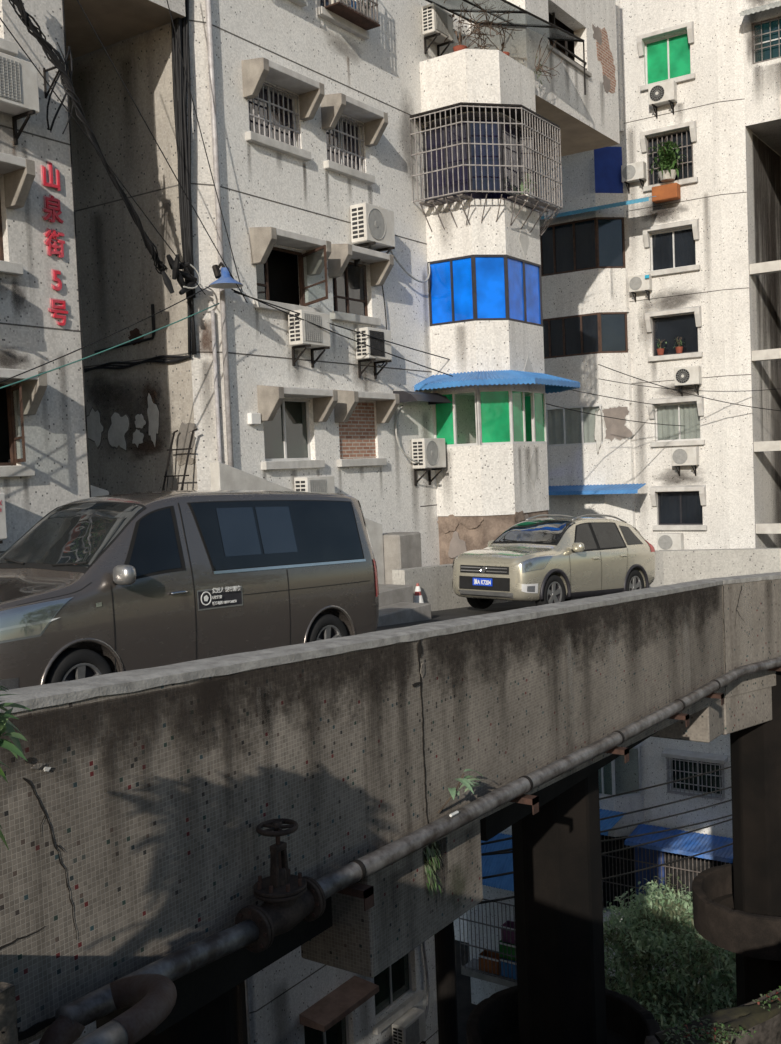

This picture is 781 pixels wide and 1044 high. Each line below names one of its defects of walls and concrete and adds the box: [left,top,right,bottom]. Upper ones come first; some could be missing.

flaking render [592,24,616,93]
peeling [87,391,160,452]
water stain [108,386,160,455]
flaking render [594,405,634,455]
water stain [427,586,718,685]
water stain [0,642,411,770]
crack [418,655,431,855]
crack [23,777,77,940]
crack [0,926,45,949]